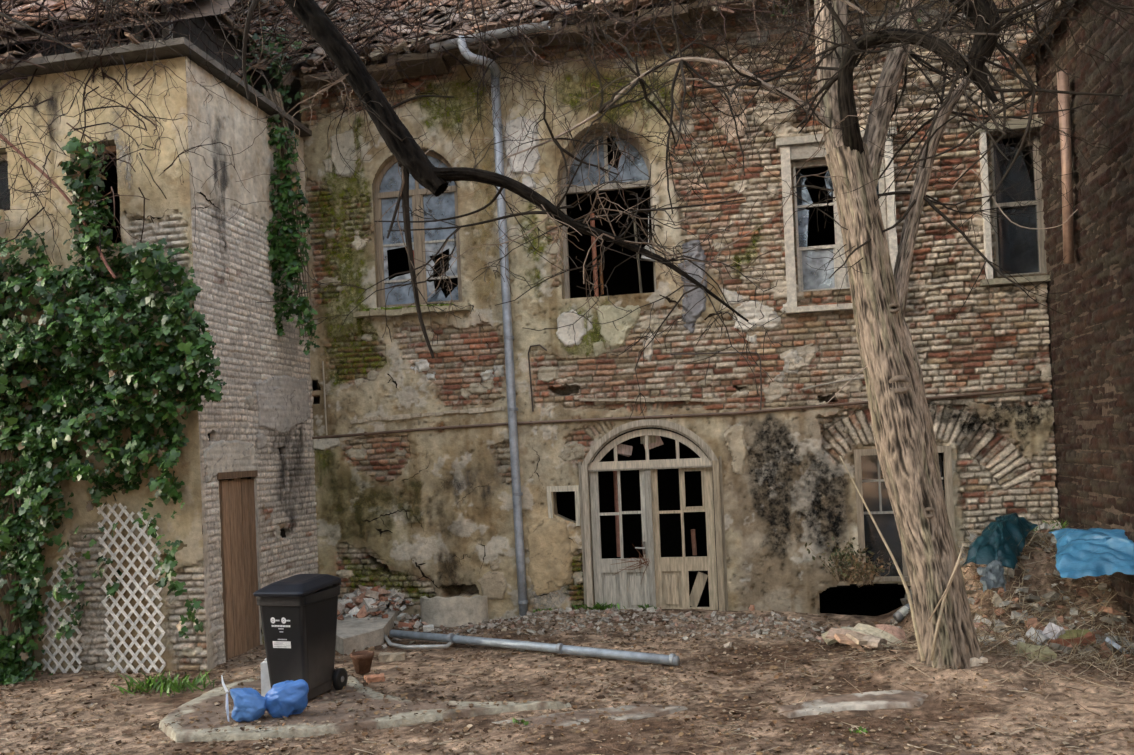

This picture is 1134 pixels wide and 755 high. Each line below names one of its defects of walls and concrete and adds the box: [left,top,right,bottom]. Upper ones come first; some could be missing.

spalling [299,68,366,129]
spalling [363,57,458,110]
spalling [853,43,891,130]
spalling [530,15,876,475]
spalling [884,15,1059,543]
spalling [124,129,411,671]
spalling [324,320,506,410]
leakage [326,456,422,540]
spalling [490,439,512,487]
spalling [336,542,479,607]